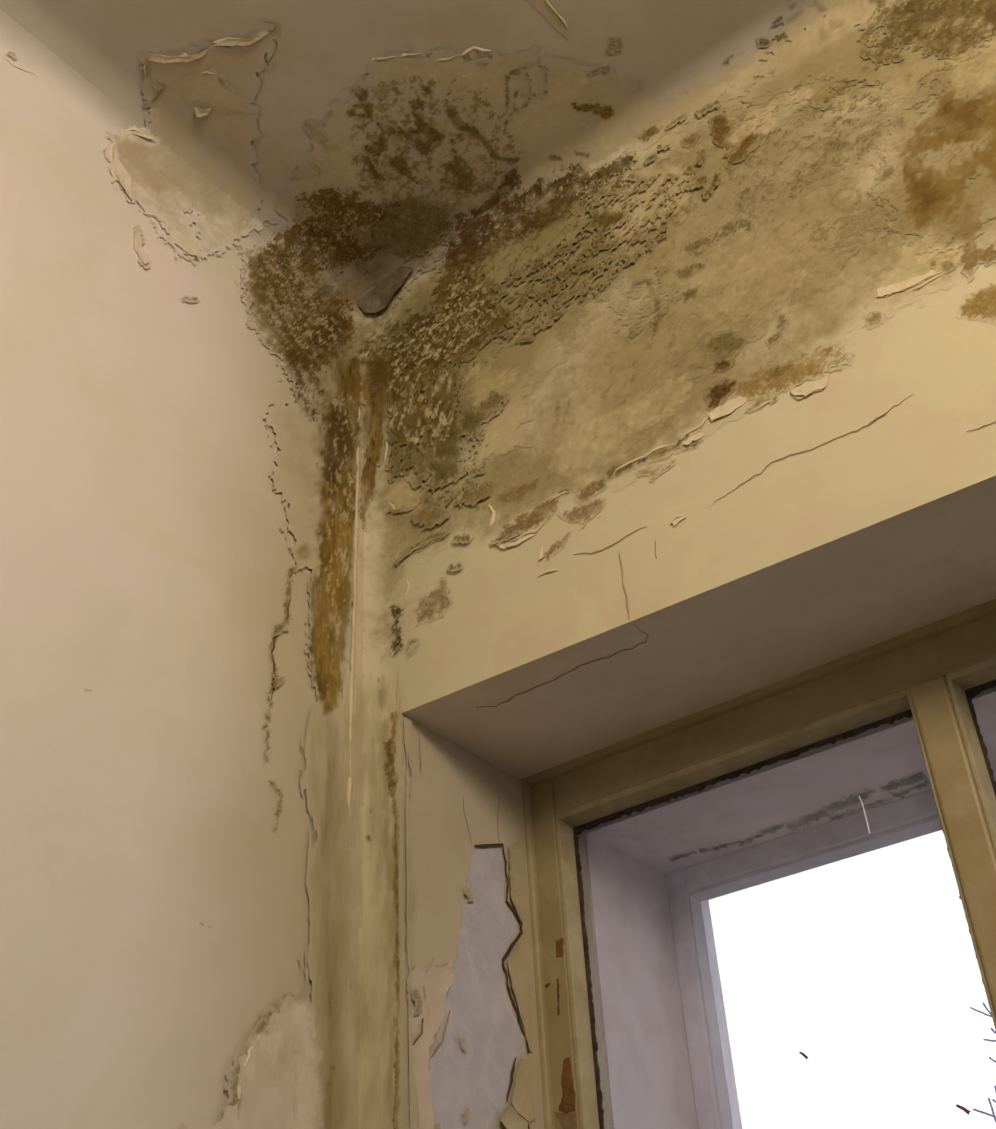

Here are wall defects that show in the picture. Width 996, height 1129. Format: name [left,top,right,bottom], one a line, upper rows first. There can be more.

peeling [103,22,280,269]
peeling [877,269,946,299]
crack [260,397,331,833]
crack [476,527,657,708]
peeling [394,376,828,577]
leakage [235,0,996,1129]
crack [714,394,914,502]
peeling [177,988,329,1129]
flaking render [406,839,535,1129]